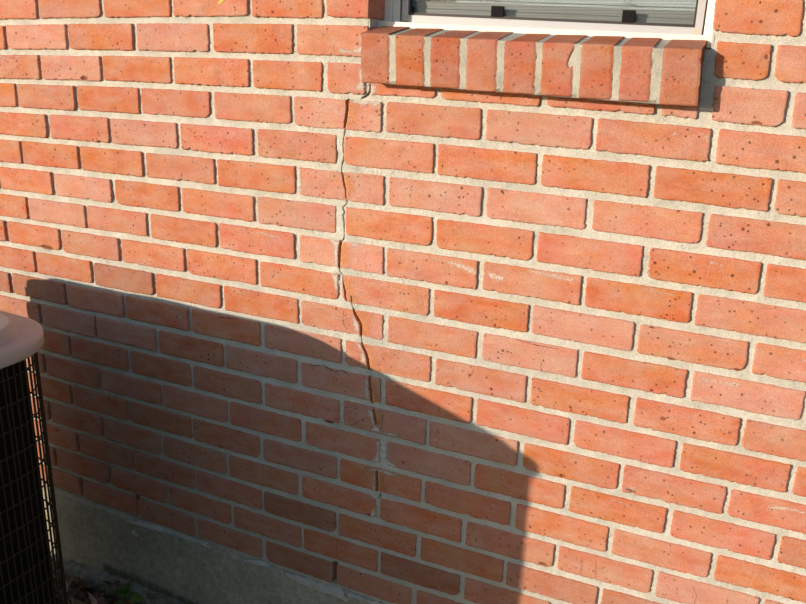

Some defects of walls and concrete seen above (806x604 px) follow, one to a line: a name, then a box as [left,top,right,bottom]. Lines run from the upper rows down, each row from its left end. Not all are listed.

crack [338,101,384,429]
crack [374,471,382,499]